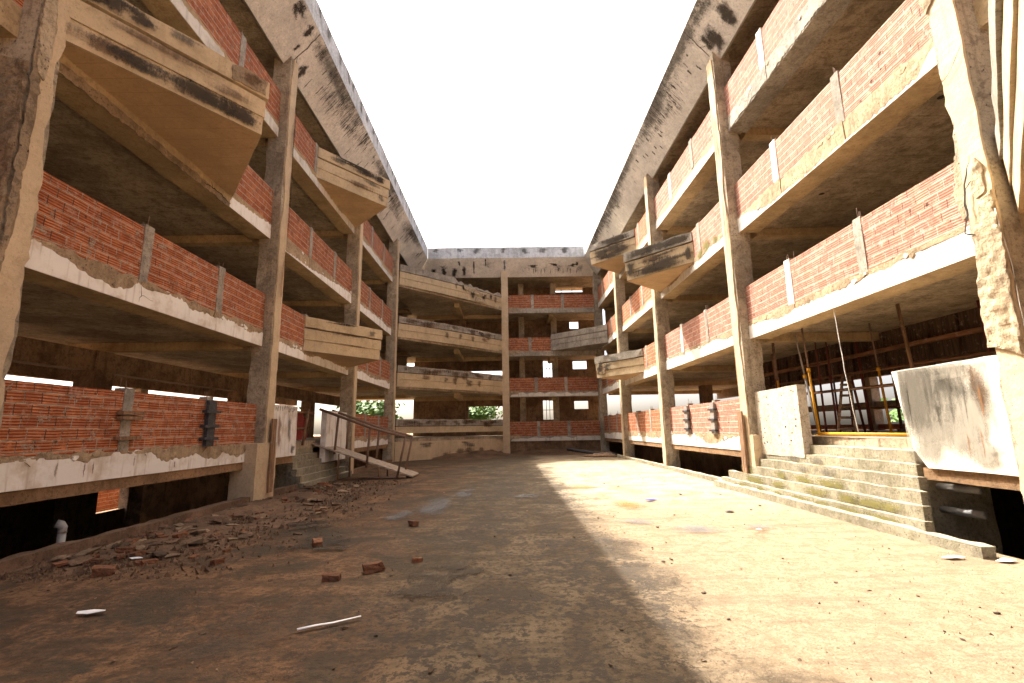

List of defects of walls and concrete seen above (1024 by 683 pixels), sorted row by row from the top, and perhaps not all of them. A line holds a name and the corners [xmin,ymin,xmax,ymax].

damp [95,0,208,71]
damp [78,29,256,126]
damp [292,1,437,258]
damp [589,0,737,277]
flaking render [32,237,262,333]
damp [431,248,506,303]
damp [520,248,583,274]
spalling [750,156,1024,355]
flaking render [0,442,246,467]
damp [897,359,1000,467]